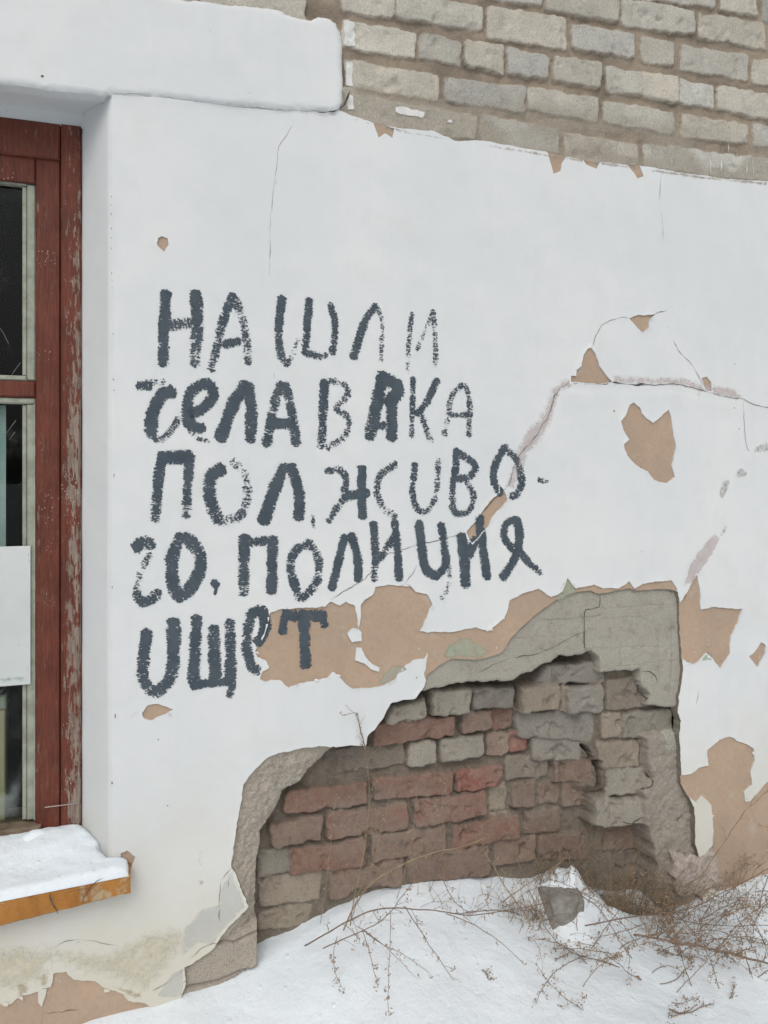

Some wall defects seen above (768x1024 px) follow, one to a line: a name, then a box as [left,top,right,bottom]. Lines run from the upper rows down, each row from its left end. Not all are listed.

peeling [374,123,394,137]
peeling [548,153,566,173]
peeling [628,165,643,178]
peeling [157,237,168,251]
peeling [613,403,675,483]
crack [332,311,768,599]
peeling [130,704,173,720]
spalling [183,577,768,993]
peeling [0,972,149,1024]